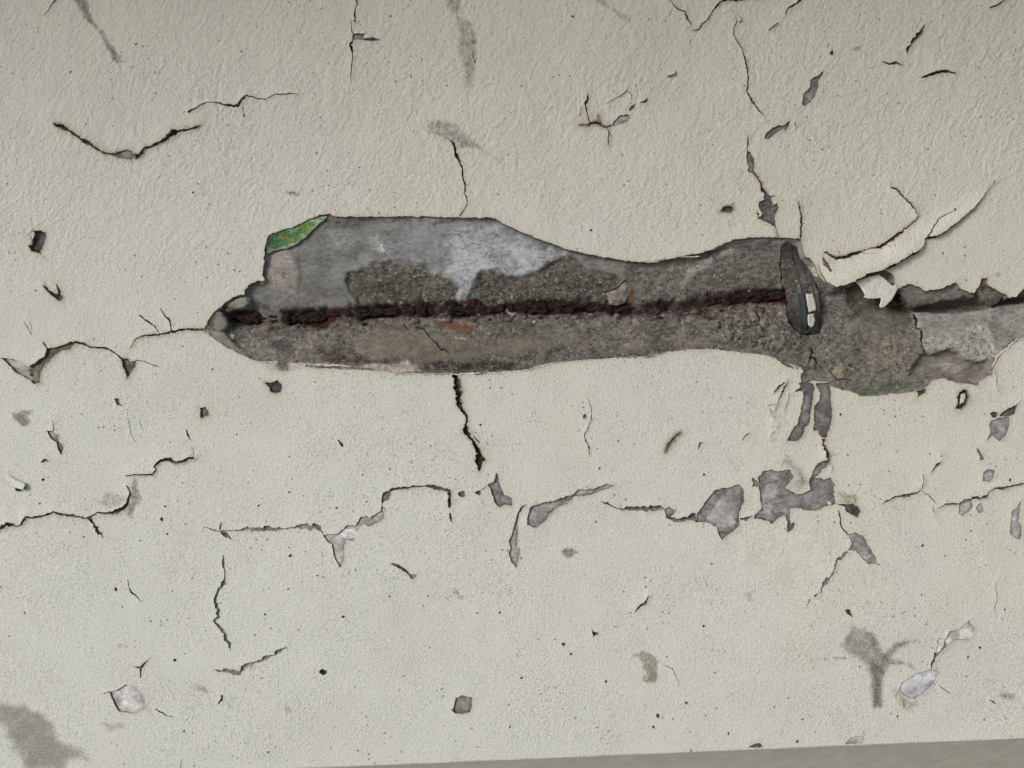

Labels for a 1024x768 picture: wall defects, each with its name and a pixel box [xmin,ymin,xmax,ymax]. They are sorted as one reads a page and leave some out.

crack [685,0,758,110]
crack [56,112,197,159]
crack [580,96,630,138]
crack [451,142,468,216]
crack [141,315,204,337]
crack [452,375,486,471]
spalling [203,214,1024,596]
crack [0,457,194,534]
crack [885,462,1023,516]
crack [210,523,324,675]
leakage [845,631,904,706]